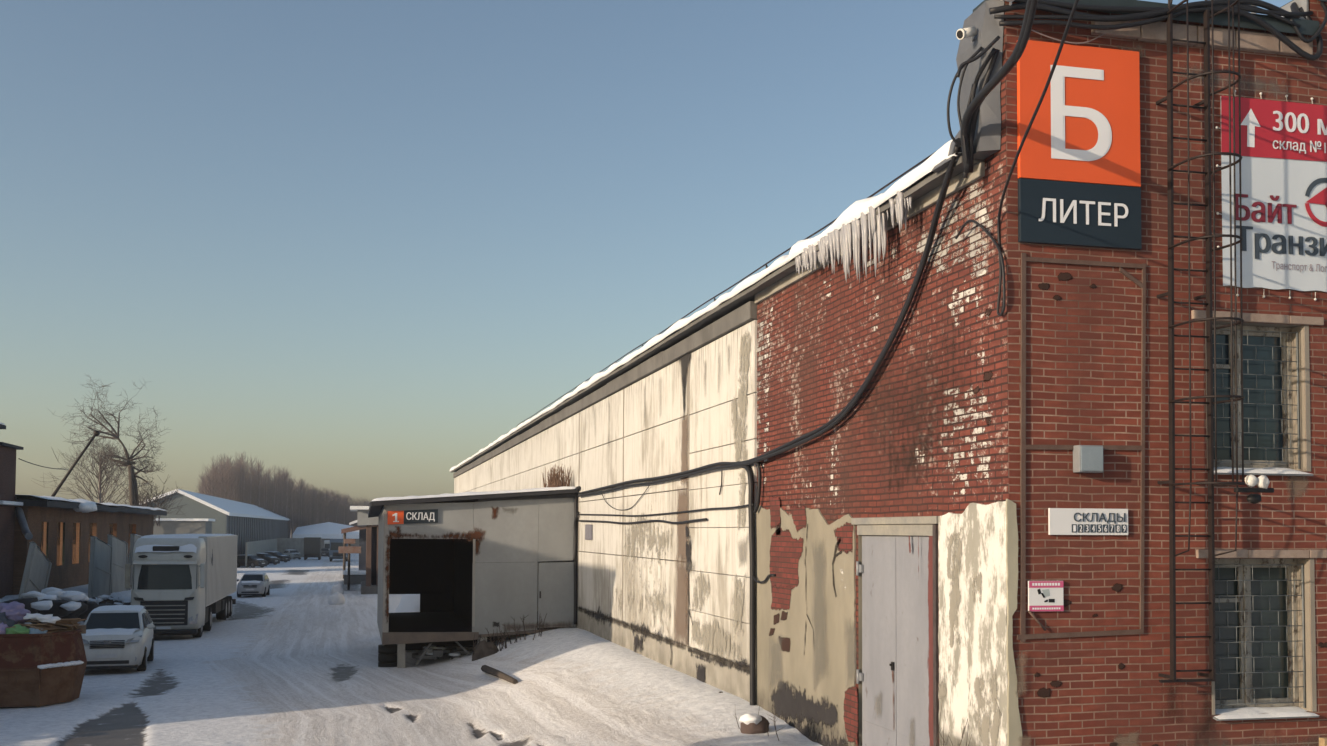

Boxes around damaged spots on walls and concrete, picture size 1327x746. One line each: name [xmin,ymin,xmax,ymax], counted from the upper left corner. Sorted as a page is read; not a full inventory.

water stain [916,181,993,329]
rust [385,507,514,622]
water stain [675,353,691,642]
flaking render [834,522,853,553]
flaking render [843,686,858,744]